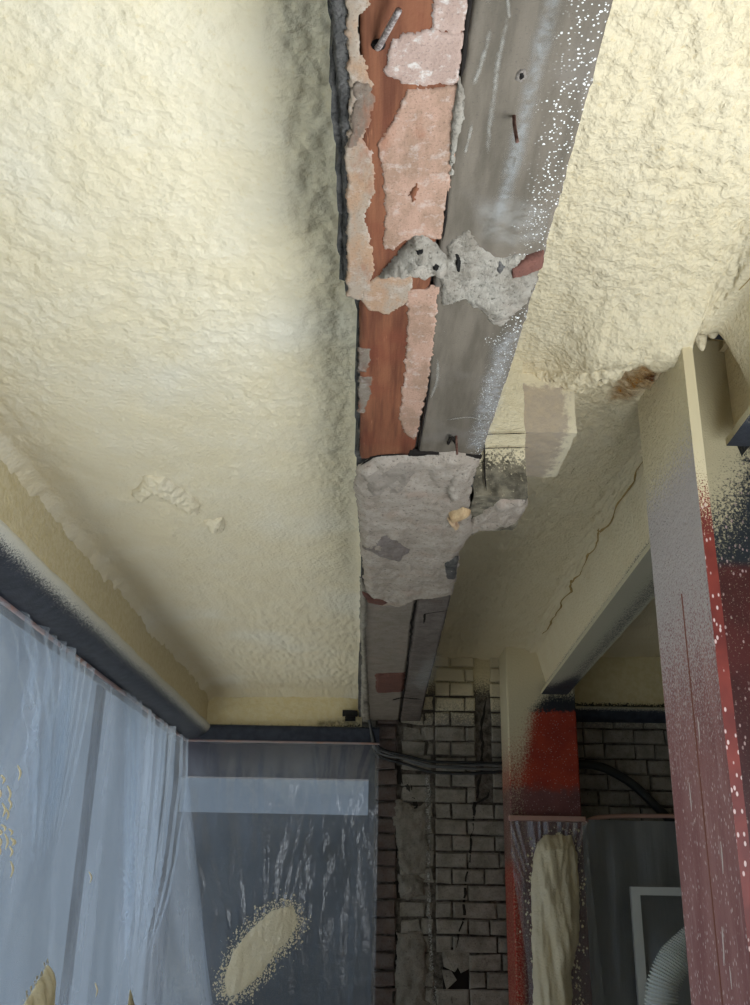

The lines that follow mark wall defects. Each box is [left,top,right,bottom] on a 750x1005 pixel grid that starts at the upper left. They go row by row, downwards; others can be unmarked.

flaking render [344,0,545,440]
corrosion [615,367,655,397]
spalling [353,451,483,607]
crack [542,461,643,634]
spalling [392,799,429,900]
spalling [395,929,431,1005]
spalling [442,947,469,989]